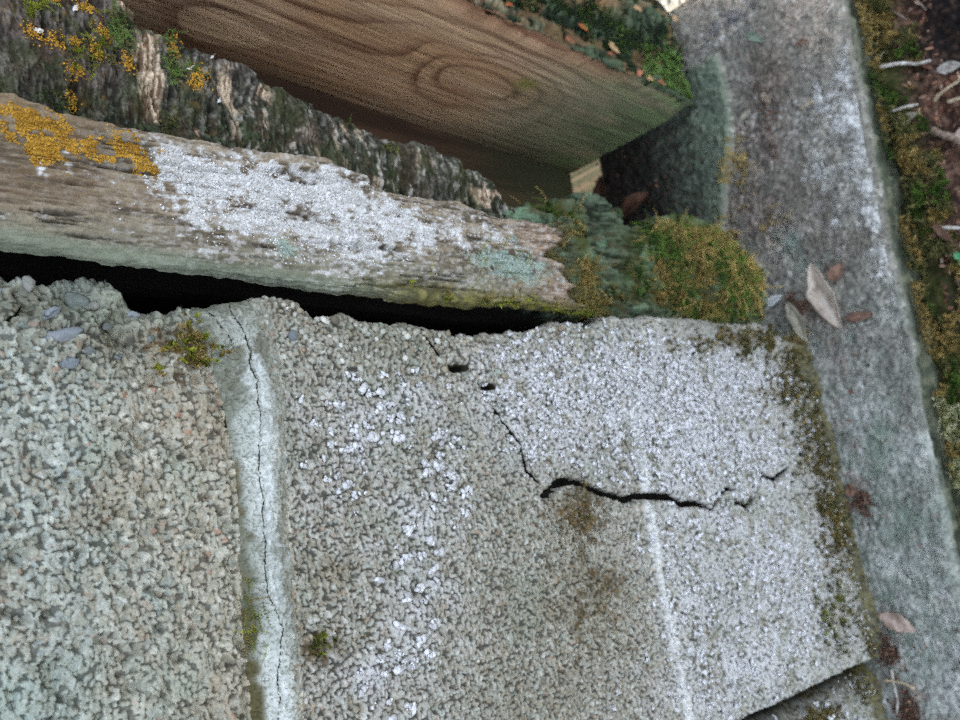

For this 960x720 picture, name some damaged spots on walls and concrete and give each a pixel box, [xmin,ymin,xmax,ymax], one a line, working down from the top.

crack [208,304,284,719]
crack [493,408,803,511]